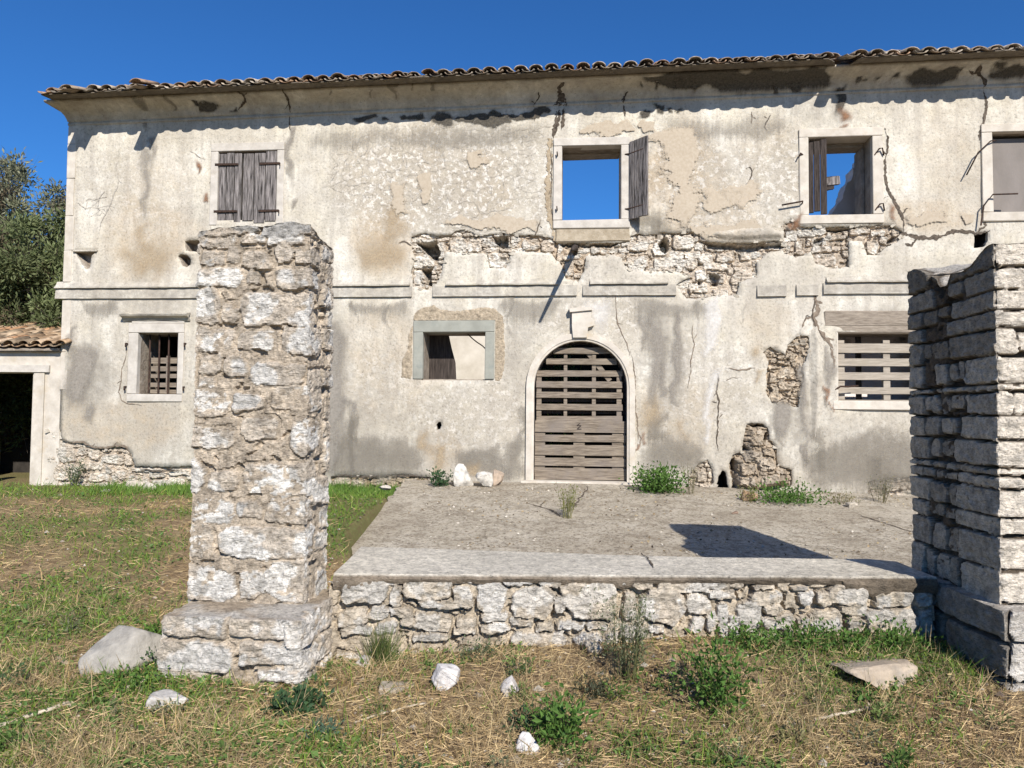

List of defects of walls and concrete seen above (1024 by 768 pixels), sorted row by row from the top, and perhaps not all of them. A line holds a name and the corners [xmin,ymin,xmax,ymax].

damp [371,106,551,144]
damp [640,66,880,111]
damp [893,67,963,86]
damp [989,62,1024,79]
flaking render [411,119,903,300]
crack [869,128,990,246]
crack [615,284,642,444]
damp [638,298,721,419]
flaking render [763,334,811,407]
crack [802,295,836,368]
crack [712,368,751,447]
flaking render [44,429,192,487]